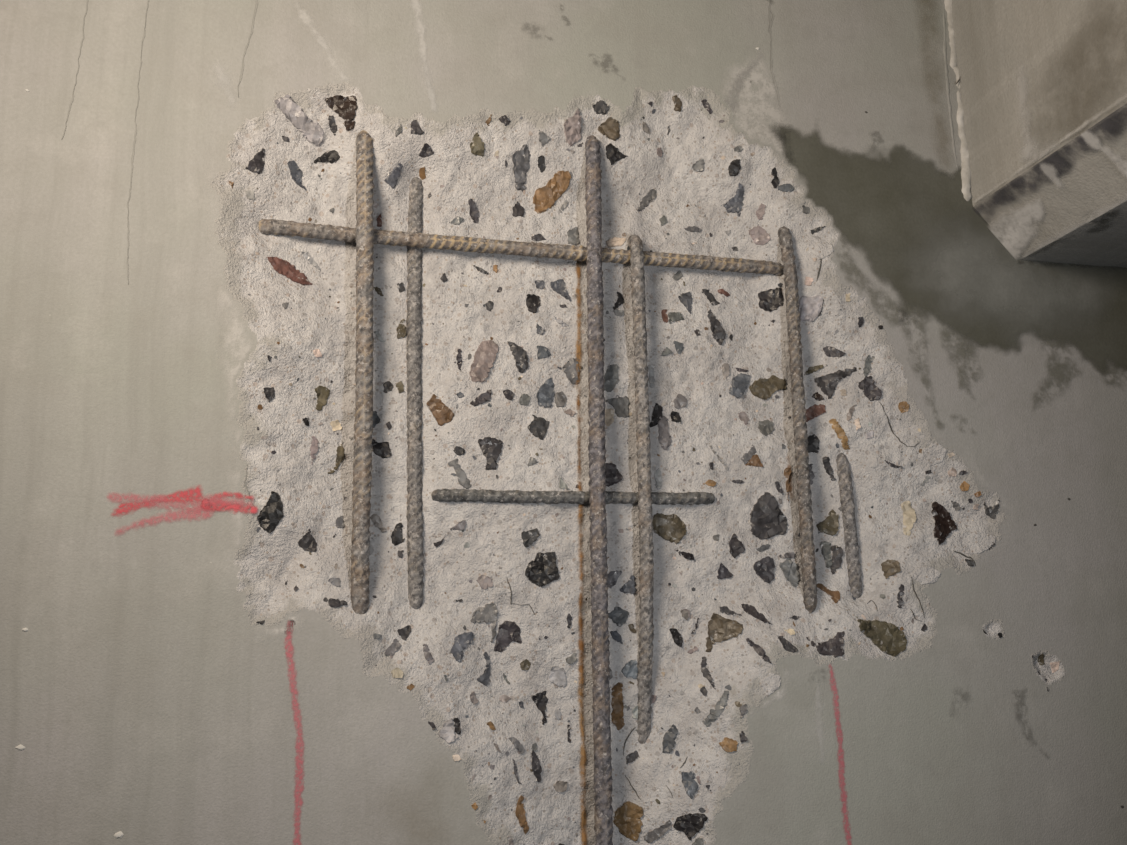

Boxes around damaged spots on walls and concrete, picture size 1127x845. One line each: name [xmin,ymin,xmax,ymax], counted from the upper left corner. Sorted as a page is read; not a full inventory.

damp [776,127,1127,401]
spalling [210,82,1007,845]
spalling [1031,650,1066,692]